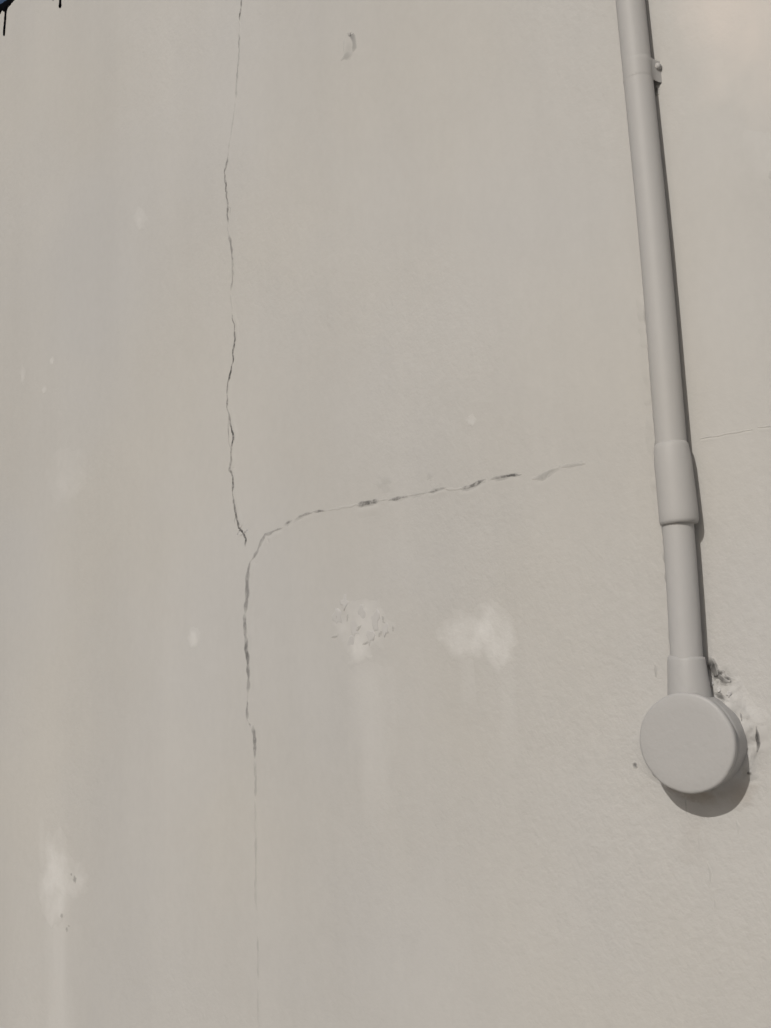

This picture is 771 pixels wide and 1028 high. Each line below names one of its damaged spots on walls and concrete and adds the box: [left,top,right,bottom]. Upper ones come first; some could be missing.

crack [224,0,585,911]